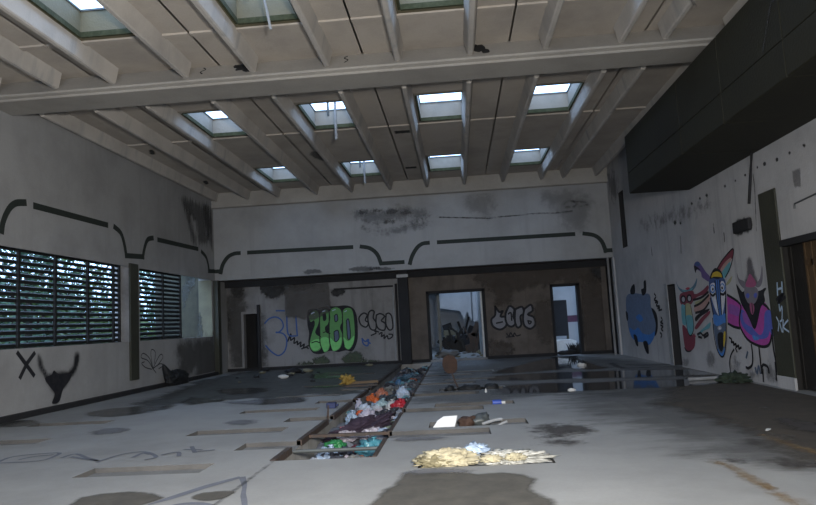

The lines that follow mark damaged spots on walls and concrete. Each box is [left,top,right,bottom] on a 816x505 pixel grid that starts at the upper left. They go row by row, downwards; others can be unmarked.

crack [439,212,533,220]